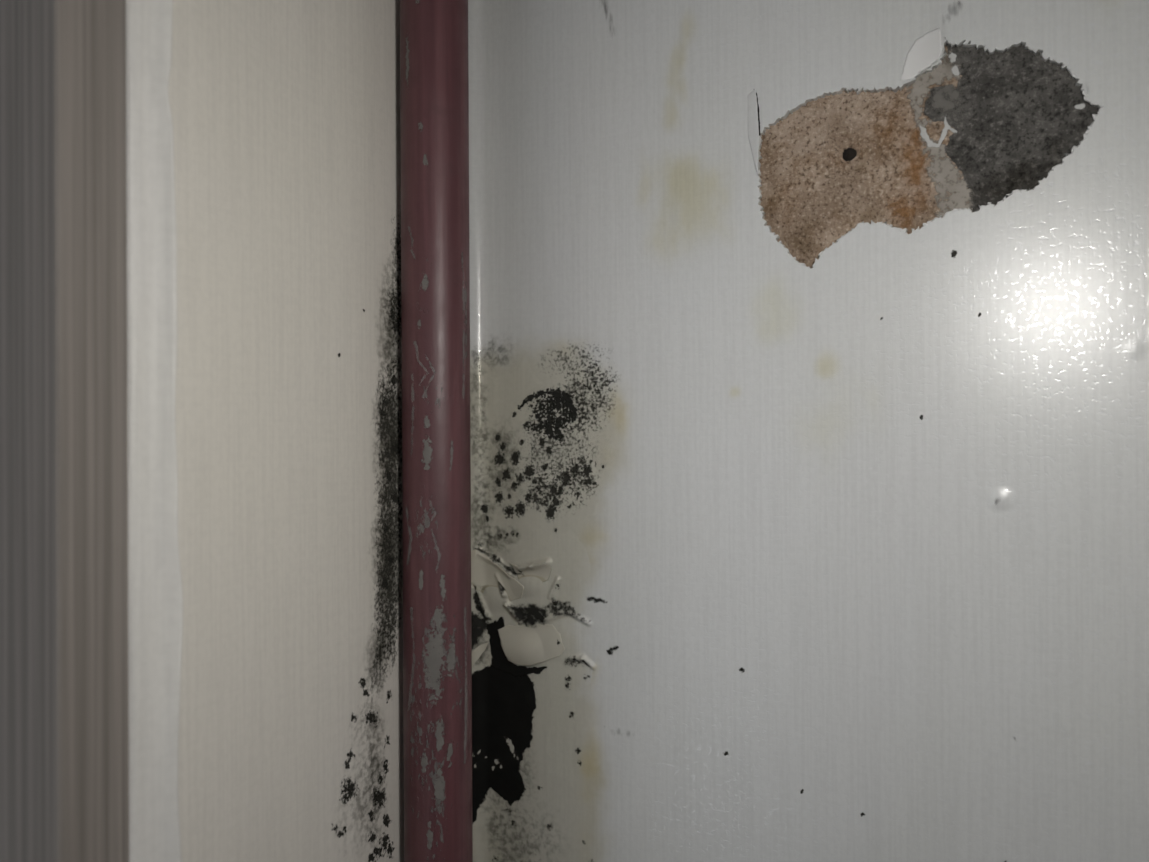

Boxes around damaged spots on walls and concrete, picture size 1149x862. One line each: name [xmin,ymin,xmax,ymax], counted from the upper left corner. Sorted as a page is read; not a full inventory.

spalling [748,28,1103,270]
damp [351,288,402,727]
damp [478,544,522,593]
damp [481,350,610,532]
damp [341,751,359,804]
damp [368,736,395,862]
damp [471,587,583,825]